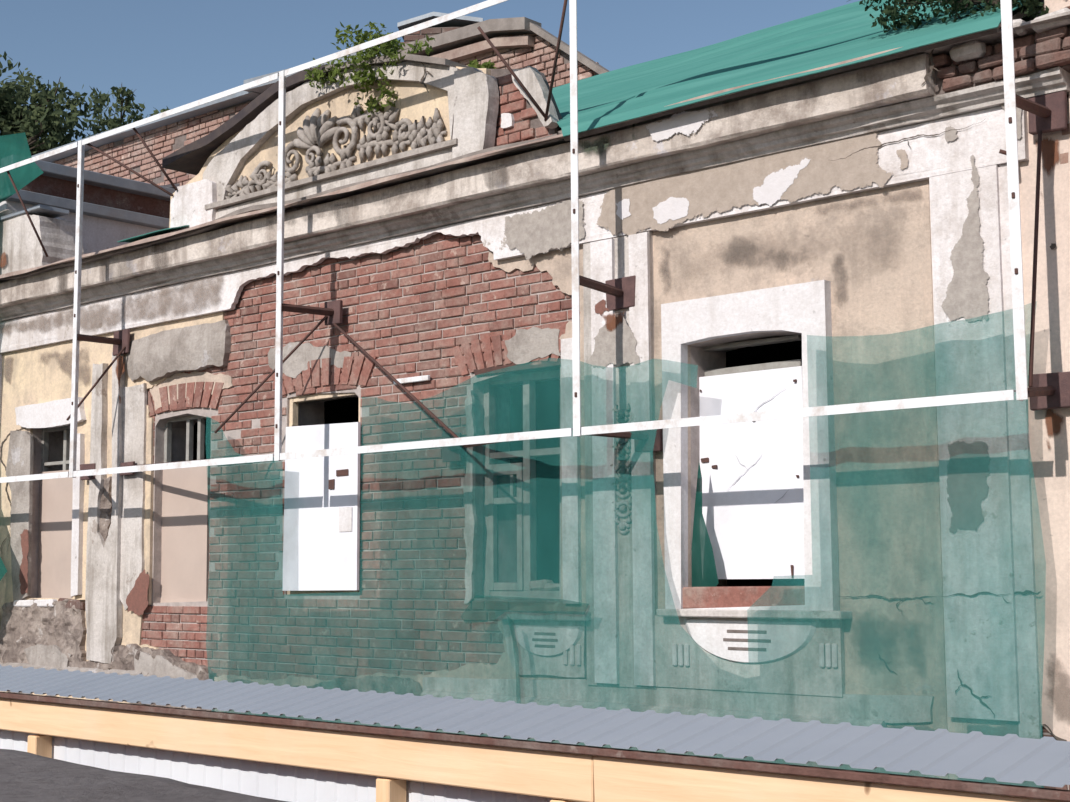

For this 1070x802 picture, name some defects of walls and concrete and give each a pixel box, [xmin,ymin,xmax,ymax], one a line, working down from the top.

flaking render [923,4,1070,96]
peeling [944,127,958,142]
peeling [1000,104,1022,139]
peeling [941,155,989,322]
flaking render [0,131,909,696]
crack [1042,724,1067,741]
peeling [979,777,1070,790]